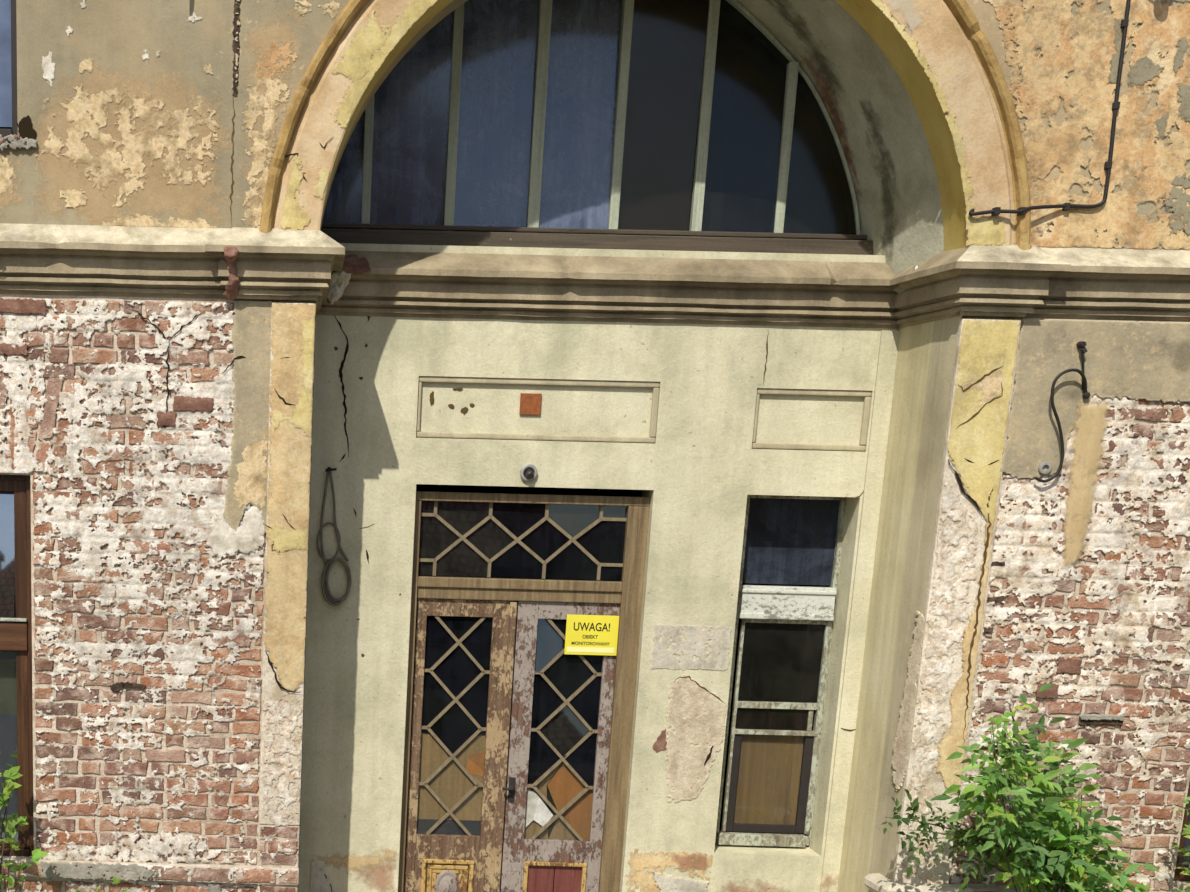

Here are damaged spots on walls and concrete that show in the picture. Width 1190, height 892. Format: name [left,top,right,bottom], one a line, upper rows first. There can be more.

peeling [0,52,219,229]
peeling [235,0,297,228]
peeling [983,0,1190,250]
crack [127,308,203,413]
crack [334,315,349,461]
crack [956,365,1004,429]
peeling [0,297,316,892]
crack [948,458,998,745]
peeling [900,394,1190,890]
peeling [653,674,727,803]
spalling [652,871,709,892]